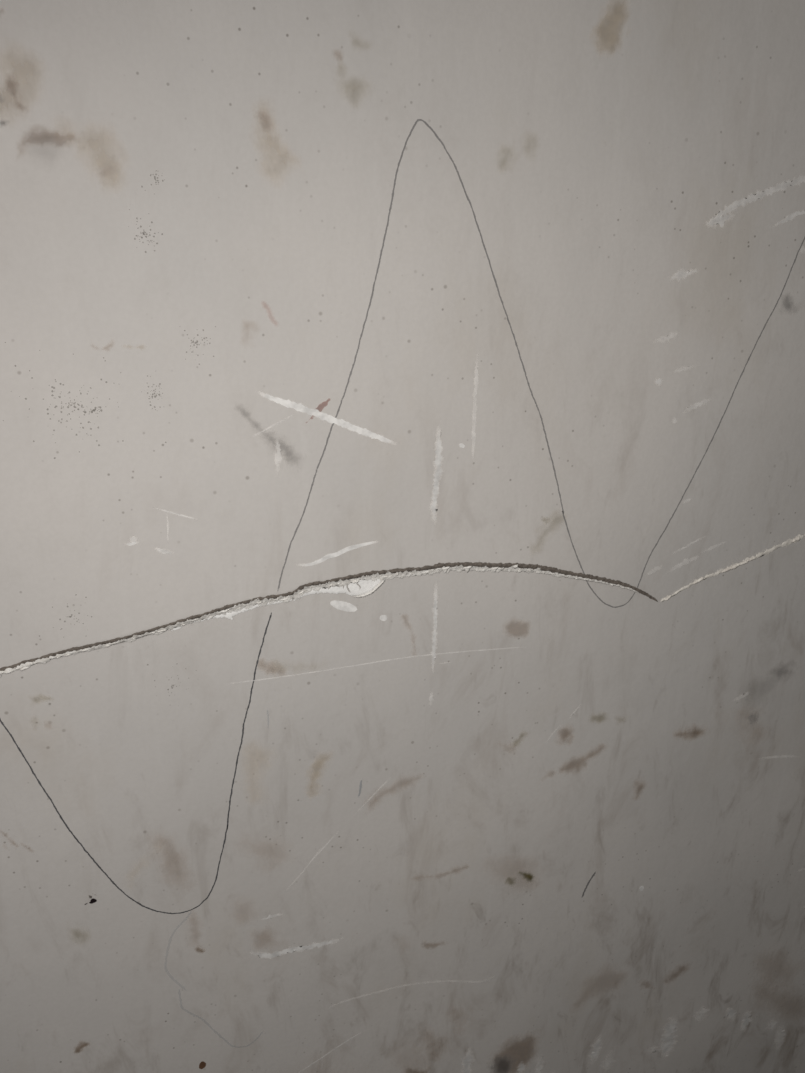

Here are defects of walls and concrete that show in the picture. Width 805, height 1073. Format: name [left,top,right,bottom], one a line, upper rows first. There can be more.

crack [0,534,805,674]